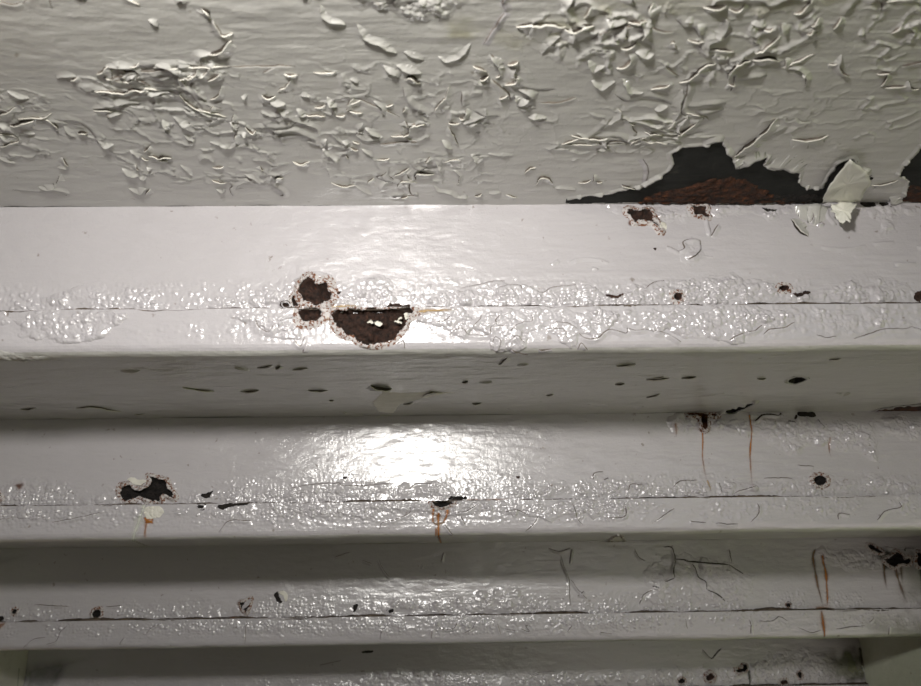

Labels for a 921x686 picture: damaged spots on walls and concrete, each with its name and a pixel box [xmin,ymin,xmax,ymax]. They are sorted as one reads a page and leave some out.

peeling [516,0,824,95]
peeling [877,71,919,92]
peeling [525,119,921,237]
peeling [366,385,452,413]
peeling [873,404,921,412]
rust [432,509,449,543]
crack [420,504,478,569]
crack [504,509,541,533]
crack [592,471,642,522]
crack [633,464,814,605]
crack [877,501,904,522]
crack [548,547,587,634]